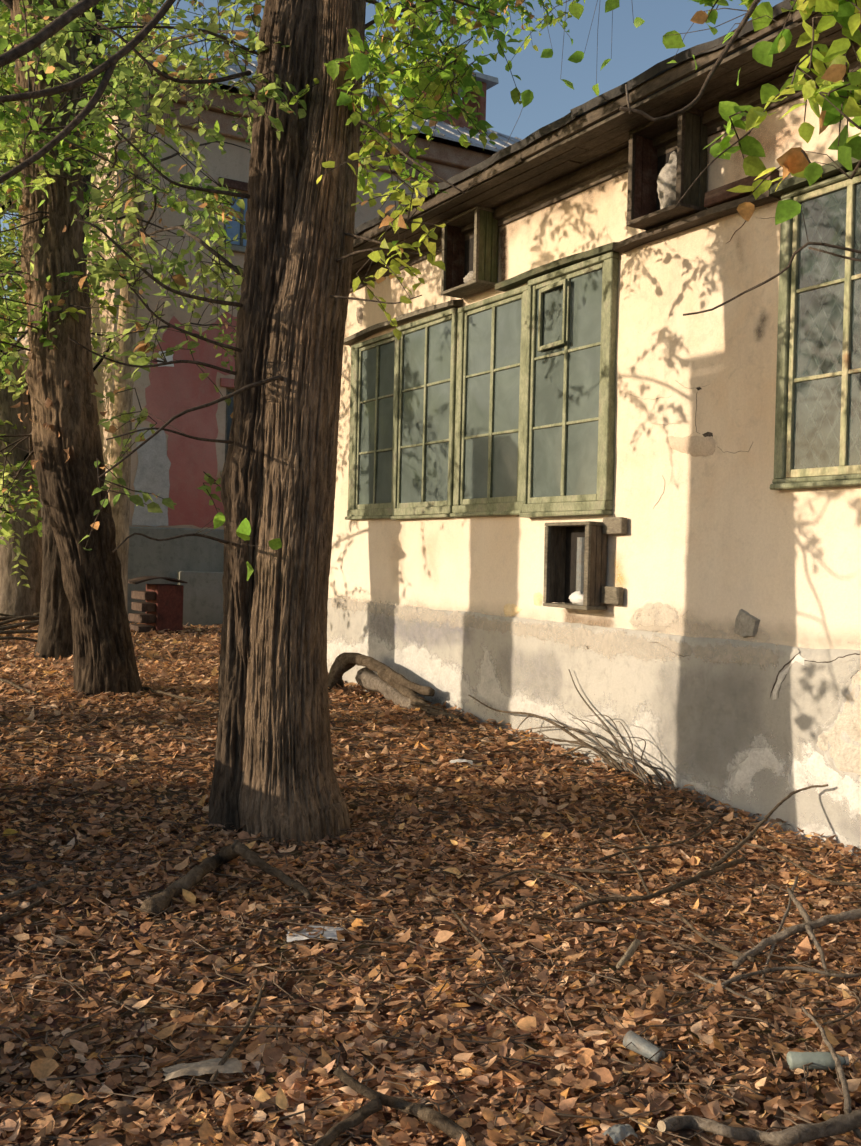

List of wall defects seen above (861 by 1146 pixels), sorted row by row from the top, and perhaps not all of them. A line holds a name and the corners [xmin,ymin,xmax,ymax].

crack [630,380,752,453]
peeling [327,630,861,858]